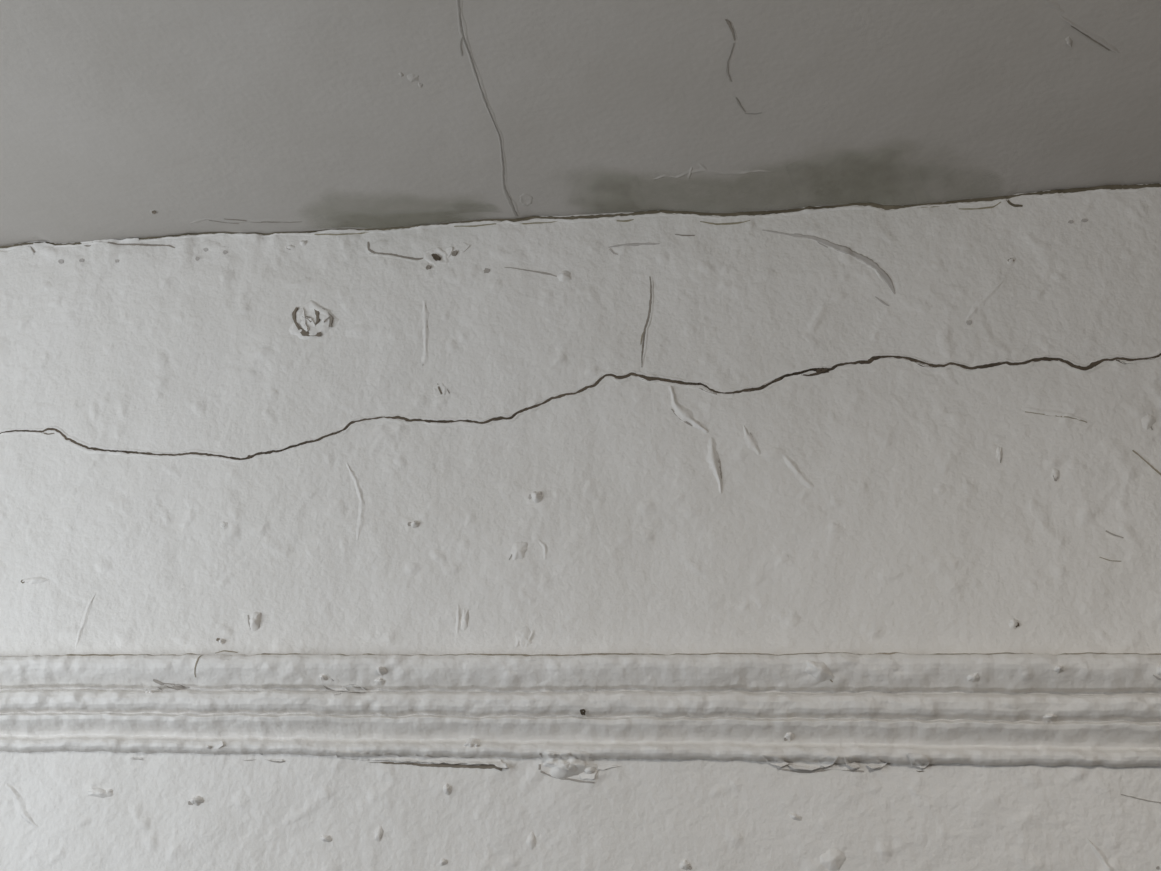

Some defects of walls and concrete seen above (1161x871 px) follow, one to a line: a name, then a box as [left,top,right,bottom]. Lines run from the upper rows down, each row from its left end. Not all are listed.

crack [0,0,1161,250]
crack [0,276,1161,462]
crack [1132,450,1161,475]